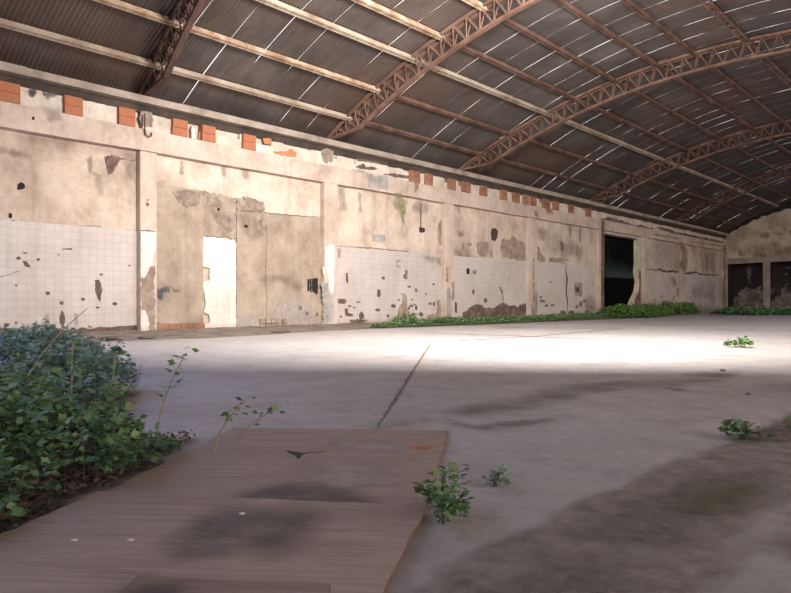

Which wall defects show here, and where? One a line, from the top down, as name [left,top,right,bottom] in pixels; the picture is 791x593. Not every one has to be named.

spalling [105,155,134,175]
flaking render [172,190,234,232]
flaking render [236,196,266,237]
spalling [45,266,156,333]
spalling [298,267,367,324]
peeling [375,228,589,321]
peeling [734,266,791,308]
crack [377,328,624,429]